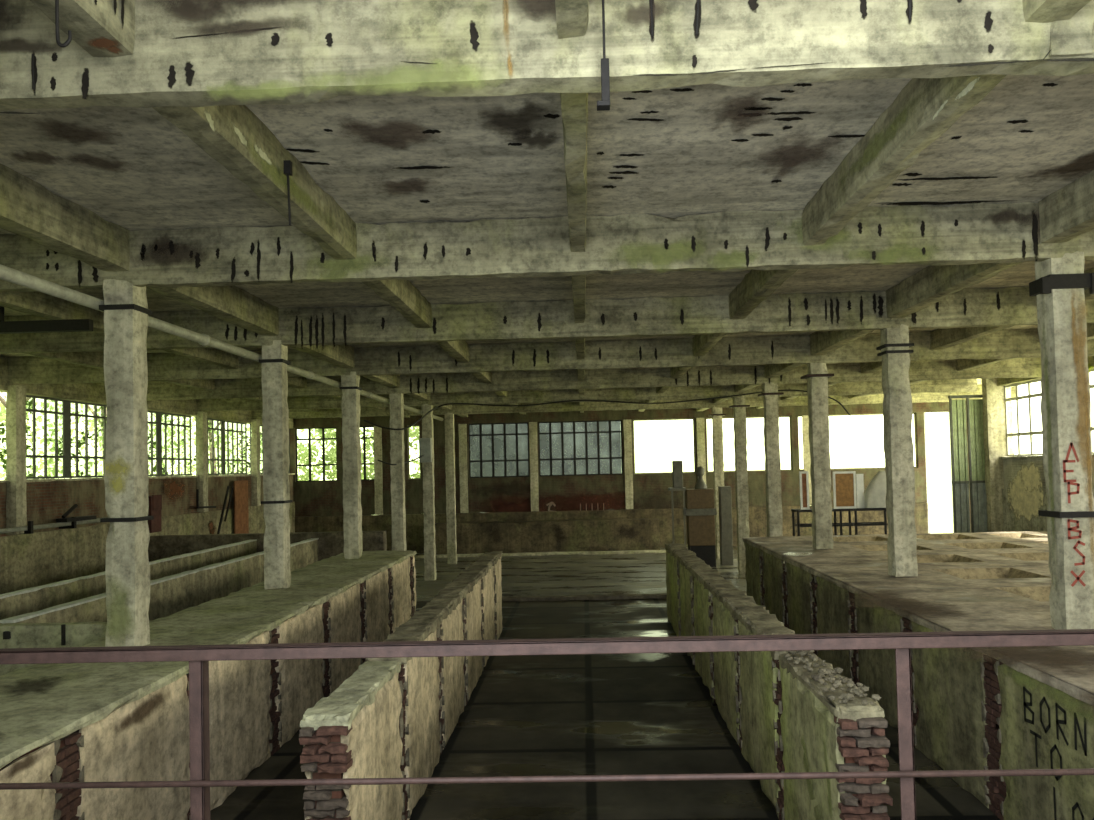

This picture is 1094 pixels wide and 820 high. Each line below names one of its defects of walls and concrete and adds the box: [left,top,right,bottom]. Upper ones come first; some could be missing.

leakage [347,123,428,147]
leakage [489,104,555,147]
leakage [722,98,765,125]
leakage [771,144,828,175]
leakage [385,180,426,192]
flaking render [50,733,85,820]